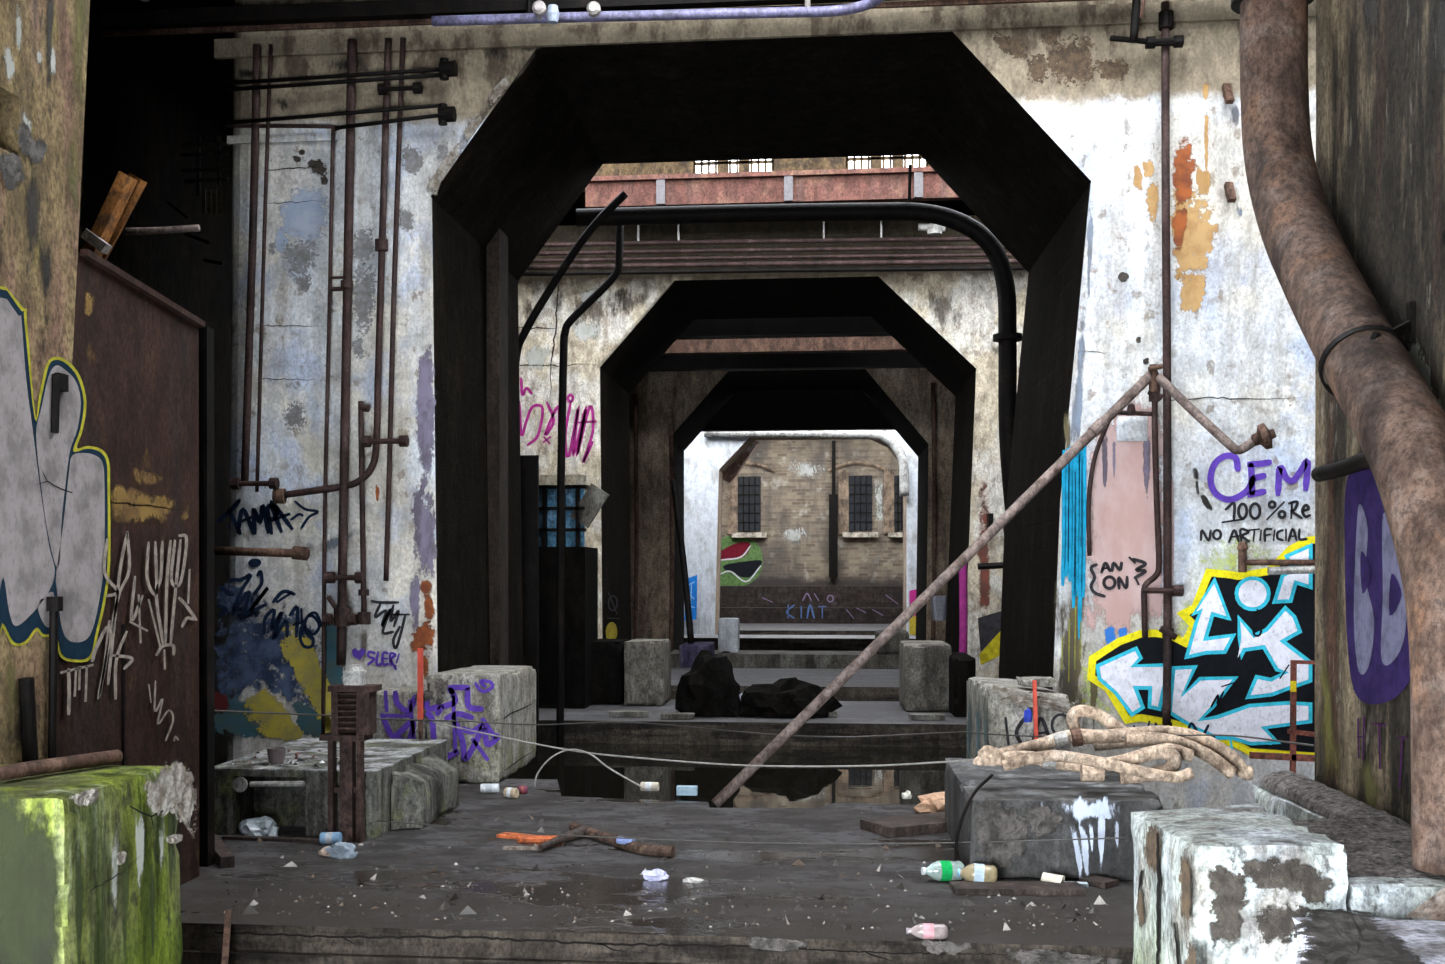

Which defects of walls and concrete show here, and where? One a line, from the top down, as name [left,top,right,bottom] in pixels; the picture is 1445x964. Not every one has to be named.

damp [1321,672,1334,763]
spalling [69,788,99,807]
spalling [144,761,199,844]
damp [0,790,59,964]
damp [75,851,84,964]
spalling [116,851,127,865]
damp [100,814,174,964]